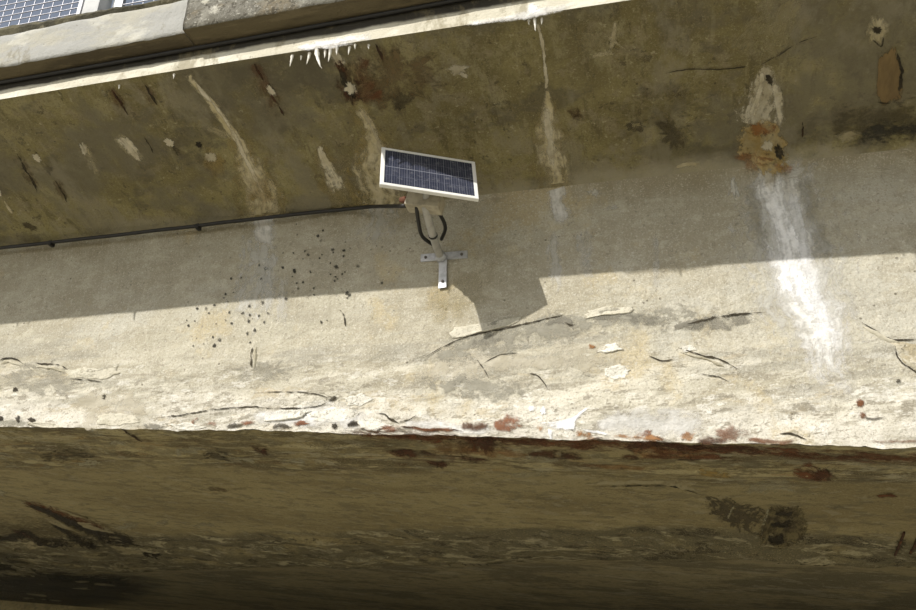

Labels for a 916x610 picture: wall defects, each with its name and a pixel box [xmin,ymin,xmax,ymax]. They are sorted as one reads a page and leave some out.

spalling [869,18,904,105]
water stain [471,4,568,221]
water stain [189,75,315,343]
crack [863,323,916,383]
crack [154,391,337,419]
rust [348,415,916,481]
spalling [0,501,160,559]
spalling [706,496,807,549]